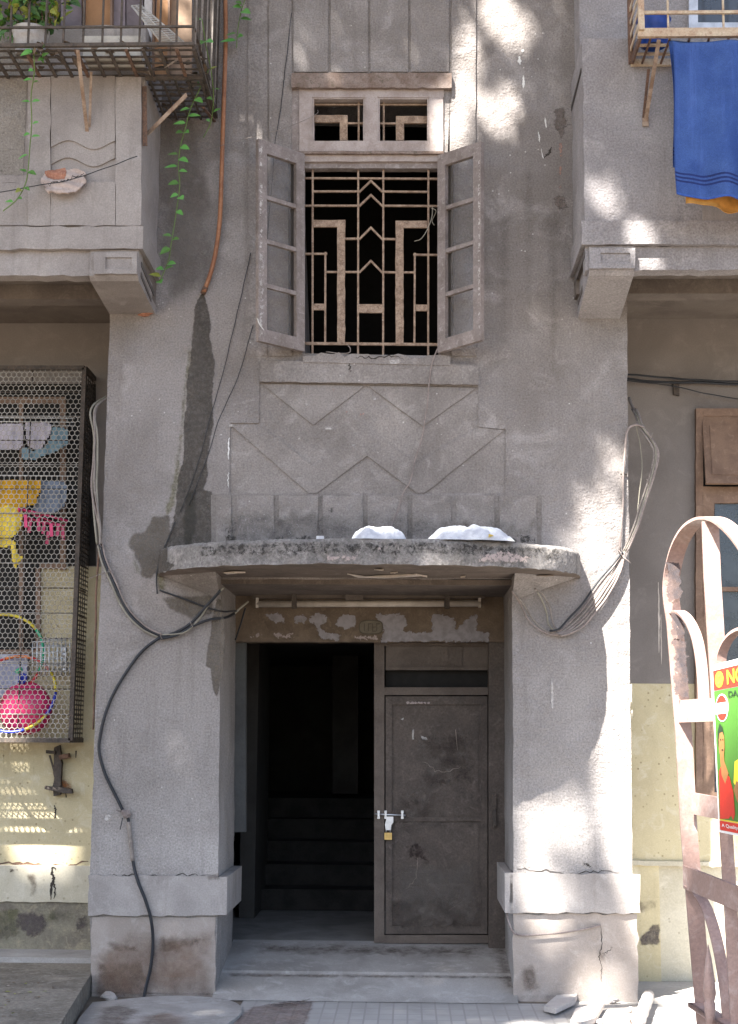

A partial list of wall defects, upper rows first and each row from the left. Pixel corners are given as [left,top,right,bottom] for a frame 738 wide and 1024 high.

flaking render [41,168,87,194]
water stain [130,294,558,695]
peeling [250,613,489,643]